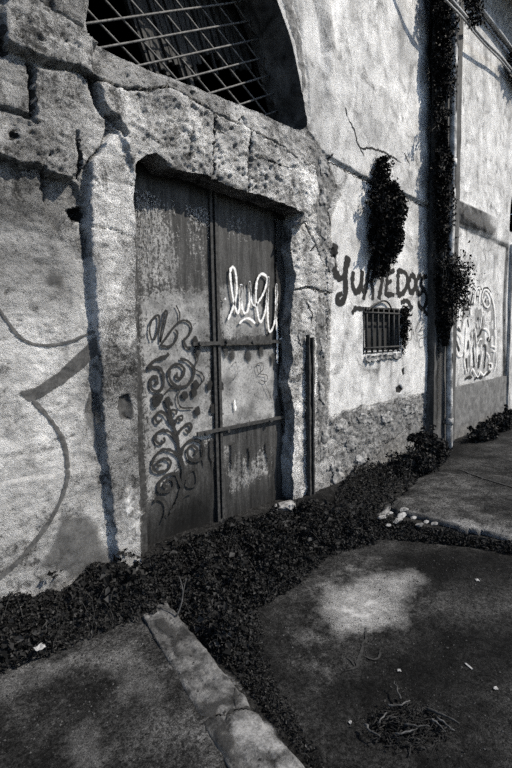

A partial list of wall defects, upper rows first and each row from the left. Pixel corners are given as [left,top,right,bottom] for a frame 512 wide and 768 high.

crack [75,137,83,177]
crack [88,80,289,192]
crack [327,153,373,185]
crack [346,109,410,164]
rust [246,219,286,365]
flaking render [316,313,427,484]
crack [216,688,260,719]